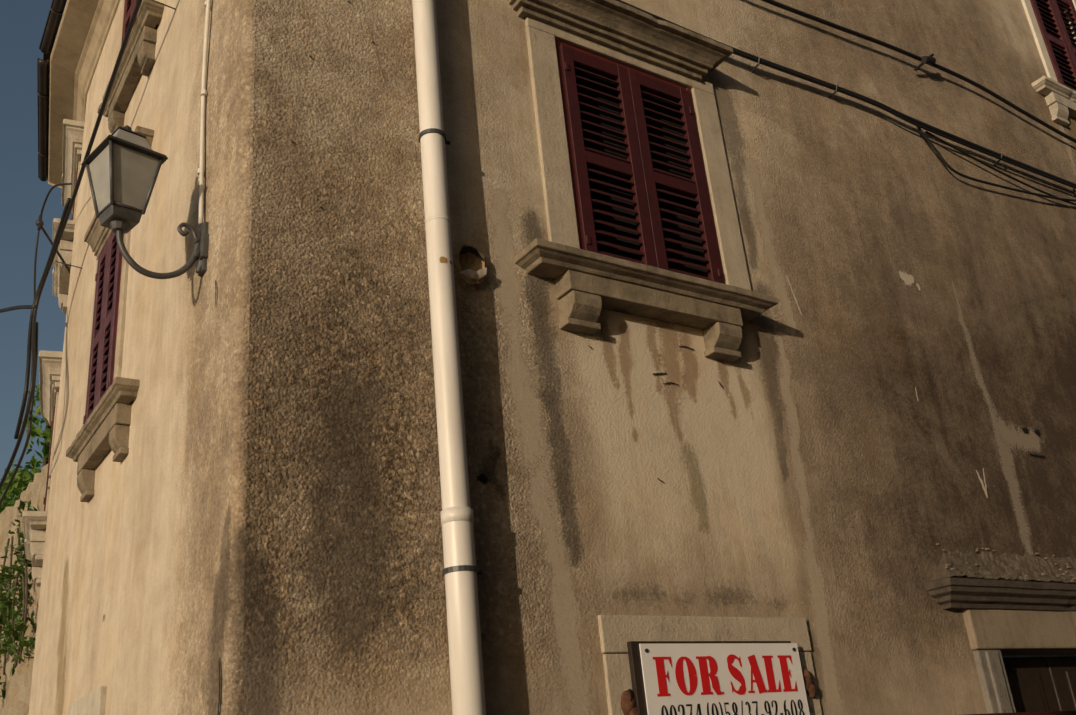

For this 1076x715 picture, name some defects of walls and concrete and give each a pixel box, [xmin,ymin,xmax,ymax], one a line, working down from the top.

water stain [489,189,596,715]
spalling [899,270,920,290]